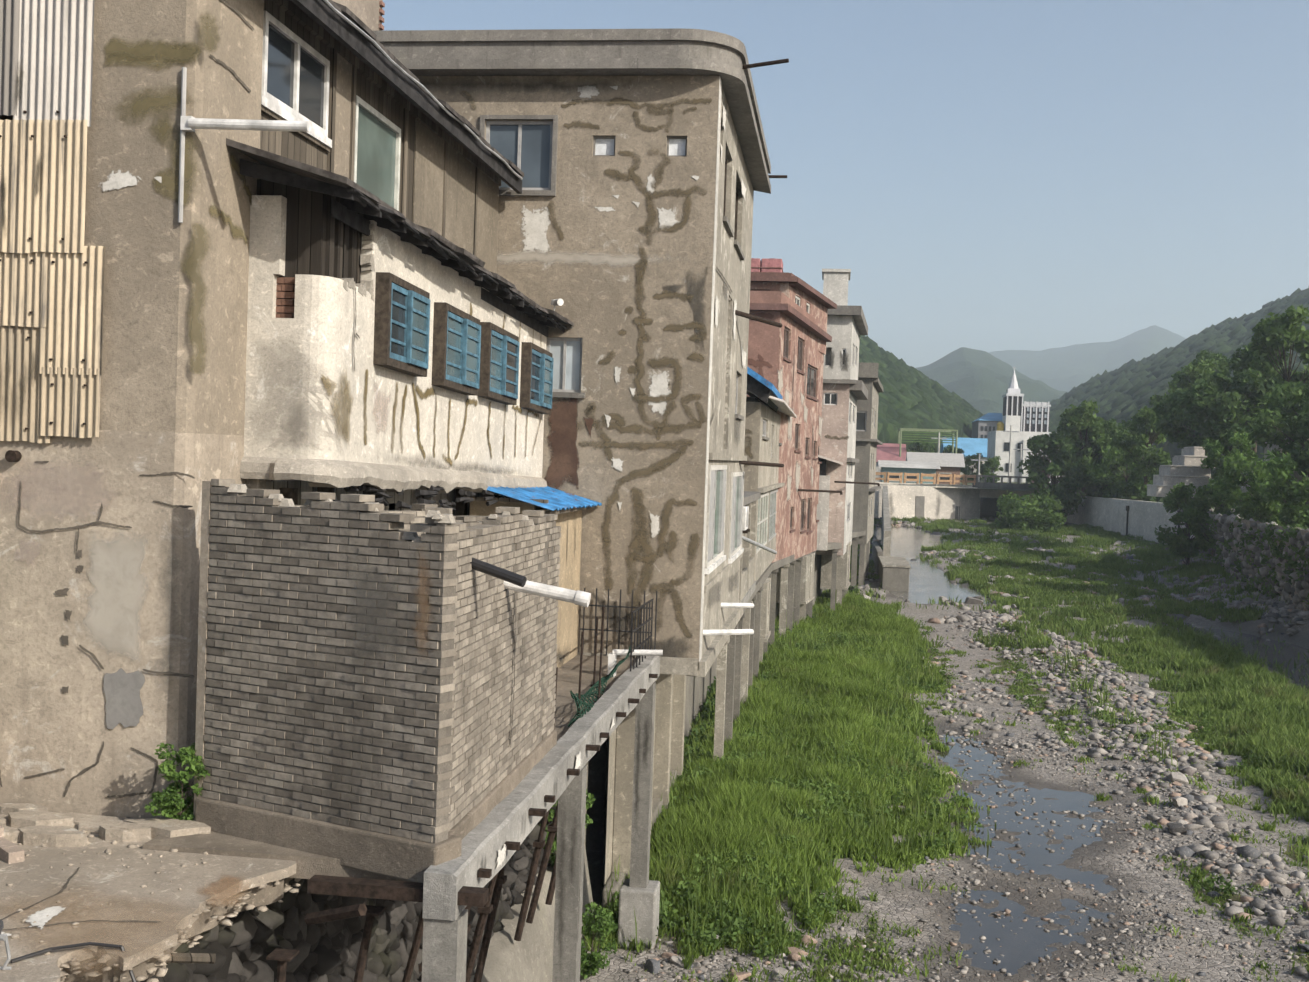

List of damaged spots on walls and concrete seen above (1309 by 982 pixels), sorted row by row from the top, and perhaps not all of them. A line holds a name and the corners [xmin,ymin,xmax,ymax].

damp [104,14,220,63]
crack [221,0,254,30]
crack [210,54,251,92]
spalling [98,170,162,192]
damp [152,118,197,191]
peeling [497,205,651,266]
crack [548,98,774,638]
crack [17,461,132,552]
crack [139,472,195,508]
crack [0,741,158,799]
crack [1,867,160,930]